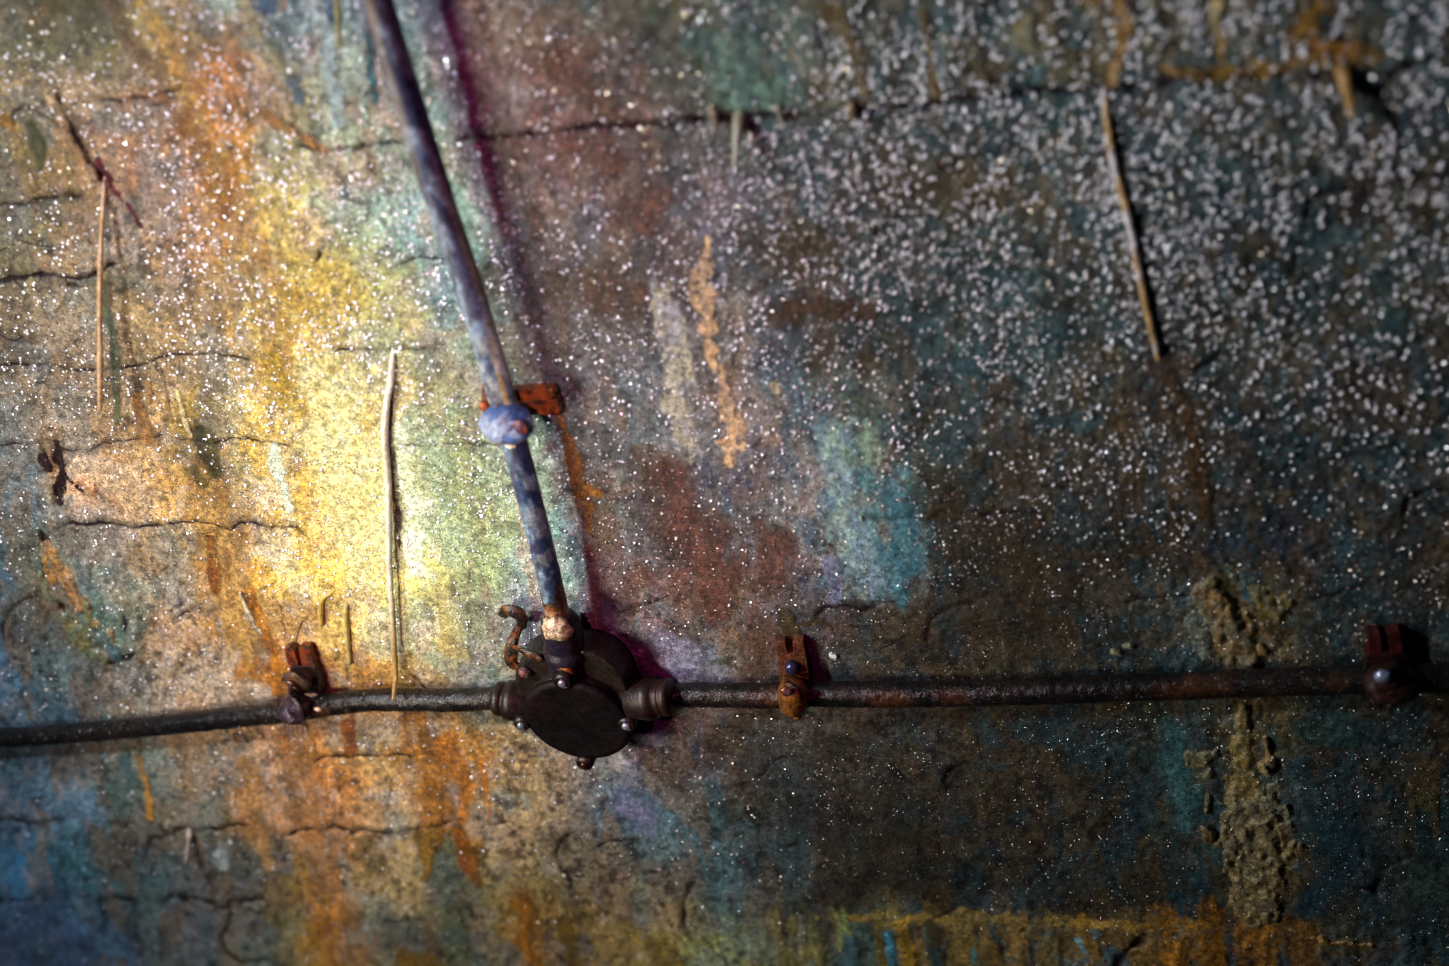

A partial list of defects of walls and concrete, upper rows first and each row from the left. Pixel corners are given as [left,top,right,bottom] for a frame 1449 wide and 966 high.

corrosion [1162,0,1381,85]
crack [0,87,108,206]
corrosion [137,2,315,387]
crack [455,76,1201,141]
crack [0,240,114,287]
crack [73,353,252,372]
crack [55,520,307,537]
corrosion [184,447,290,696]
leakage [1183,564,1296,669]
corrosion [136,755,154,820]
corrosion [403,712,490,889]
leakage [766,703,1374,966]